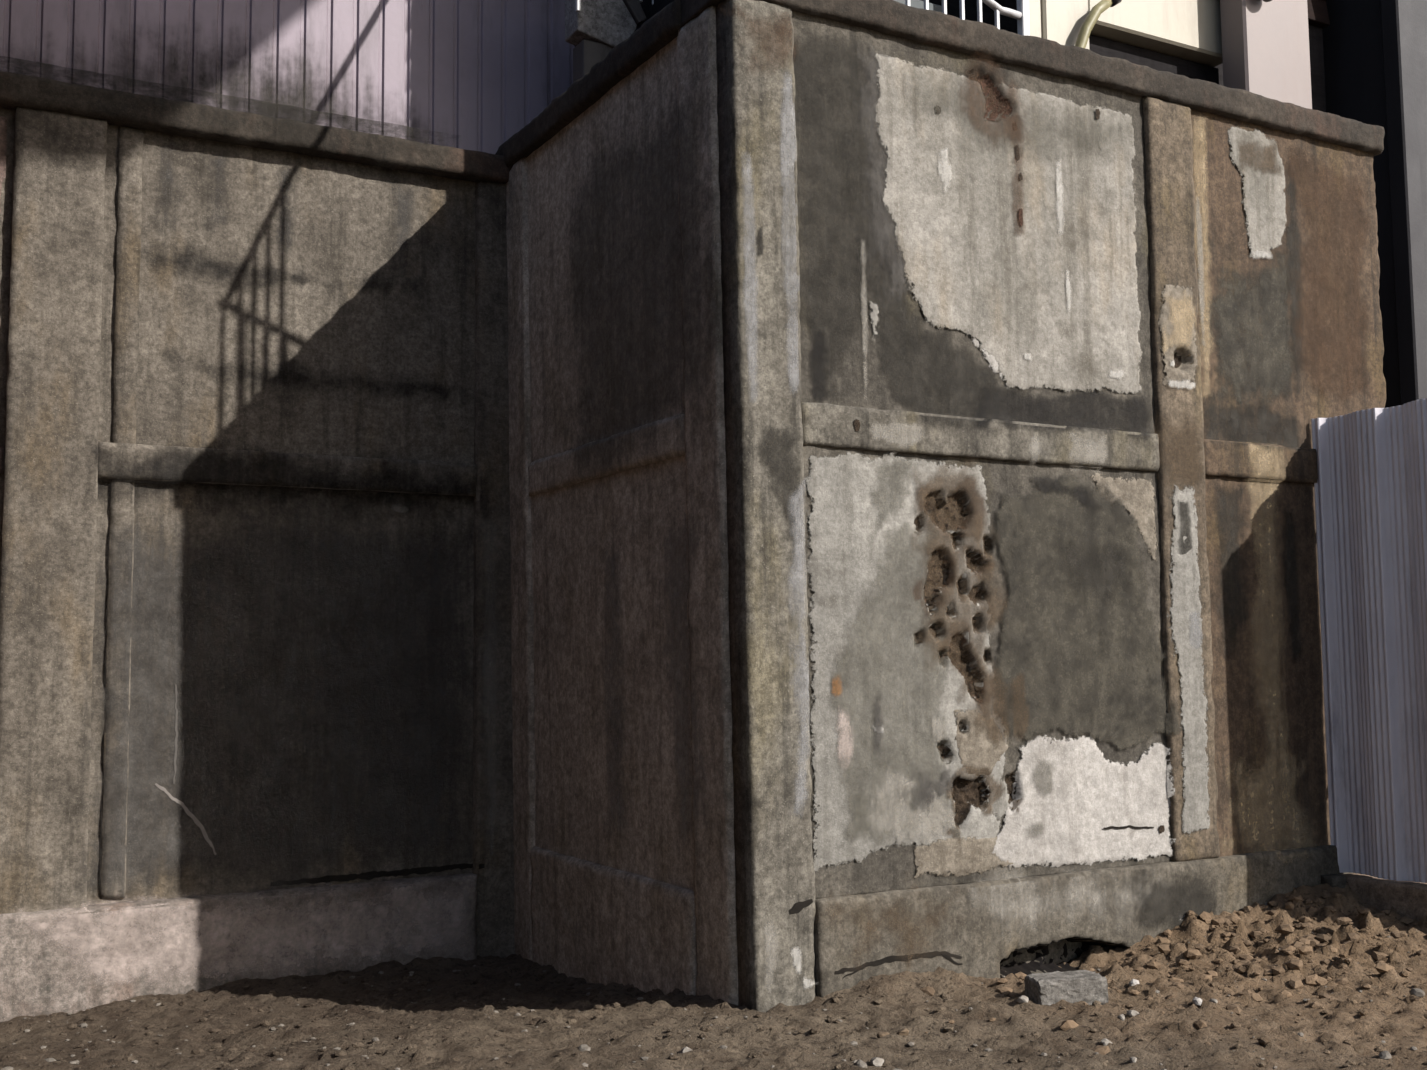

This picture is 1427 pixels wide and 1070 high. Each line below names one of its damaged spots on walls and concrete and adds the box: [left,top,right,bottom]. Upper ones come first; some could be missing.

peeling [874,53,1143,394]
corrosion [1012,121,1023,227]
peeling [1228,126,1287,258]
peeling [869,301,879,339]
water stain [781,36,1181,750]
spalling [1158,284,1198,389]
water stain [1166,169,1302,483]
water stain [1219,490,1248,653]
water stain [835,528,955,840]
peeling [805,451,1210,879]
crack [835,951,962,978]